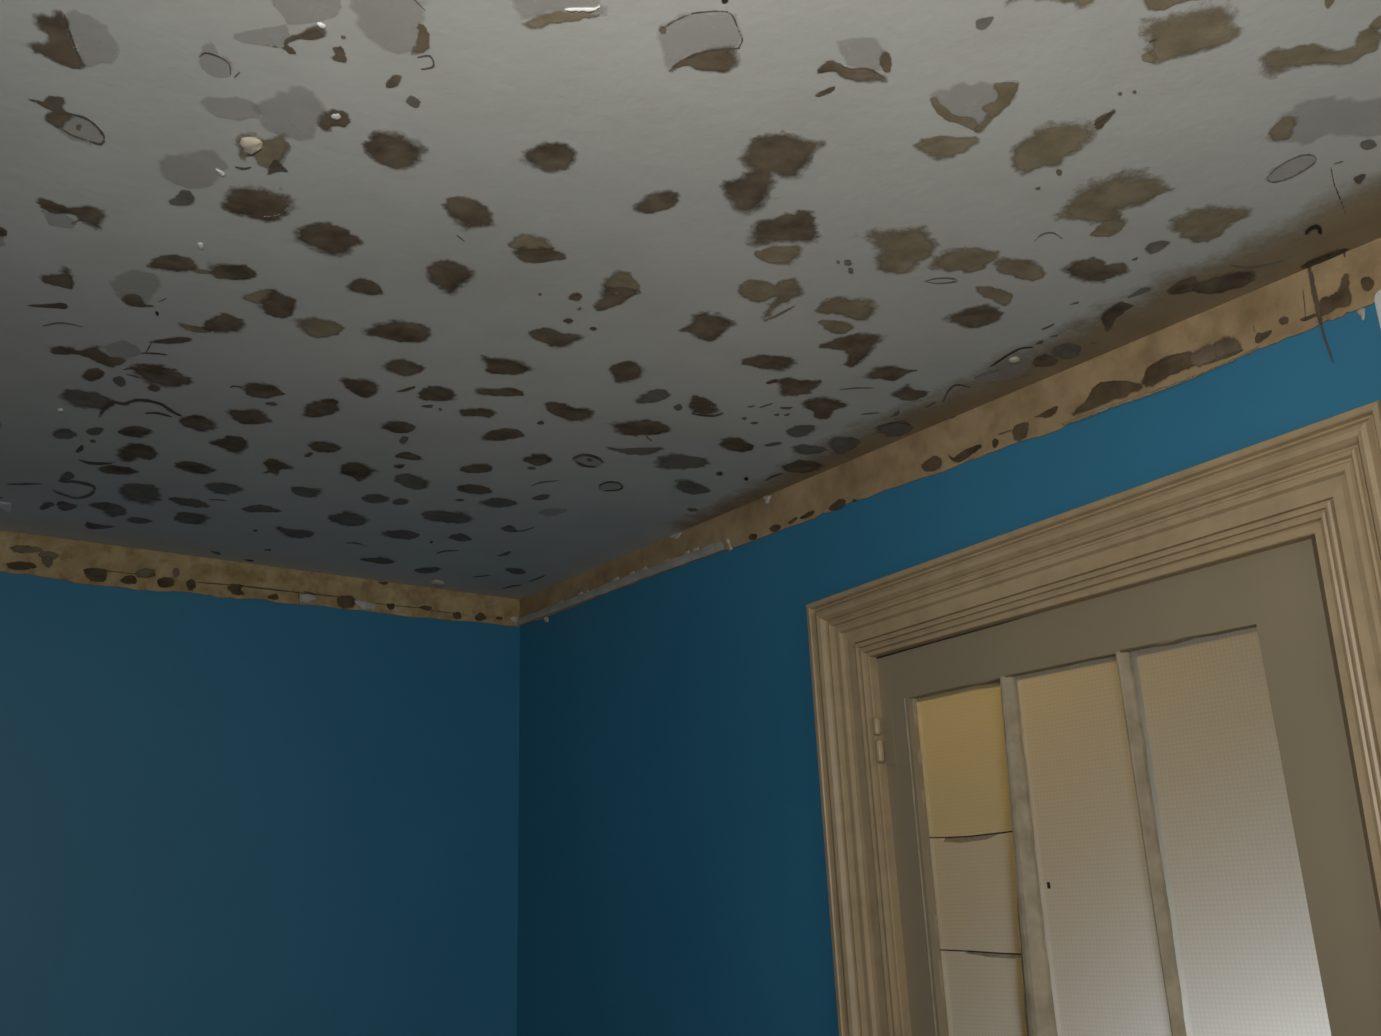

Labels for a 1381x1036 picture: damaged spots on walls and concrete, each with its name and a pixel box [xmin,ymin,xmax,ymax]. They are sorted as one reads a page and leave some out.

spalling [30,11,84,69]
peeling [659,0,743,72]
spalling [1142,0,1240,64]
spalling [1262,16,1381,74]
spalling [215,134,292,221]
spalling [363,132,425,169]
spalling [525,142,575,172]
peeling [915,82,1018,159]
spalling [1012,90,1136,176]
spalling [723,134,824,321]
spalling [1066,207,1249,283]
flaking render [0,227,1381,626]